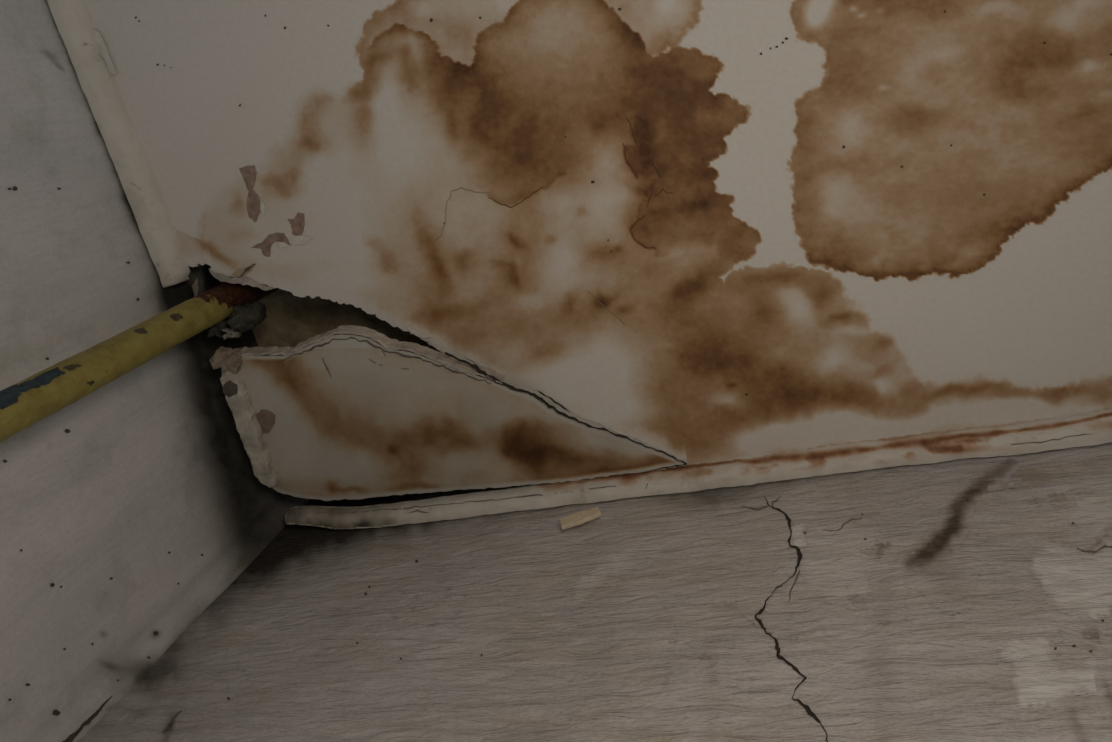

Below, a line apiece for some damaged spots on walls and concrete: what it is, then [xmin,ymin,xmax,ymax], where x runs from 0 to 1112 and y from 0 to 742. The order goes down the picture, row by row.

peeling [239,165,266,222]
leakage [4,0,1112,465]
peeling [223,381,238,397]
peeling [256,410,276,434]
leakage [0,327,1004,742]
corrosion [526,408,1112,500]
leakage [979,442,1112,555]
crack [741,496,861,742]